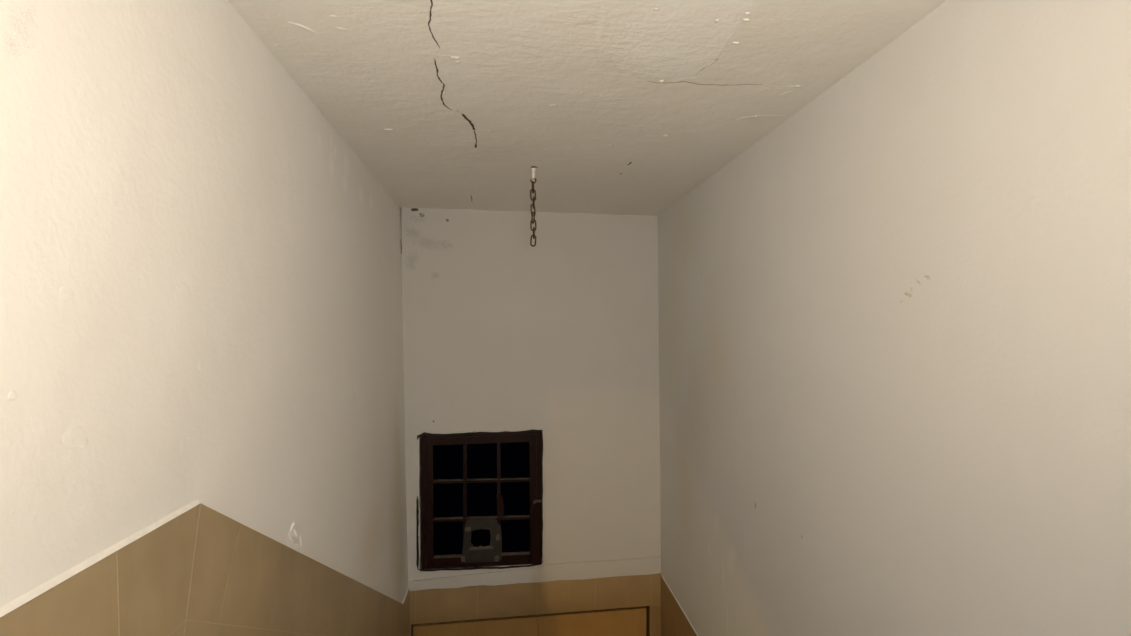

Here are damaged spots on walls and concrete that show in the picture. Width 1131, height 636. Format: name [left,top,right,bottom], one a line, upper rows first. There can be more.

crack [428,0,489,148]
crack [648,59,759,86]